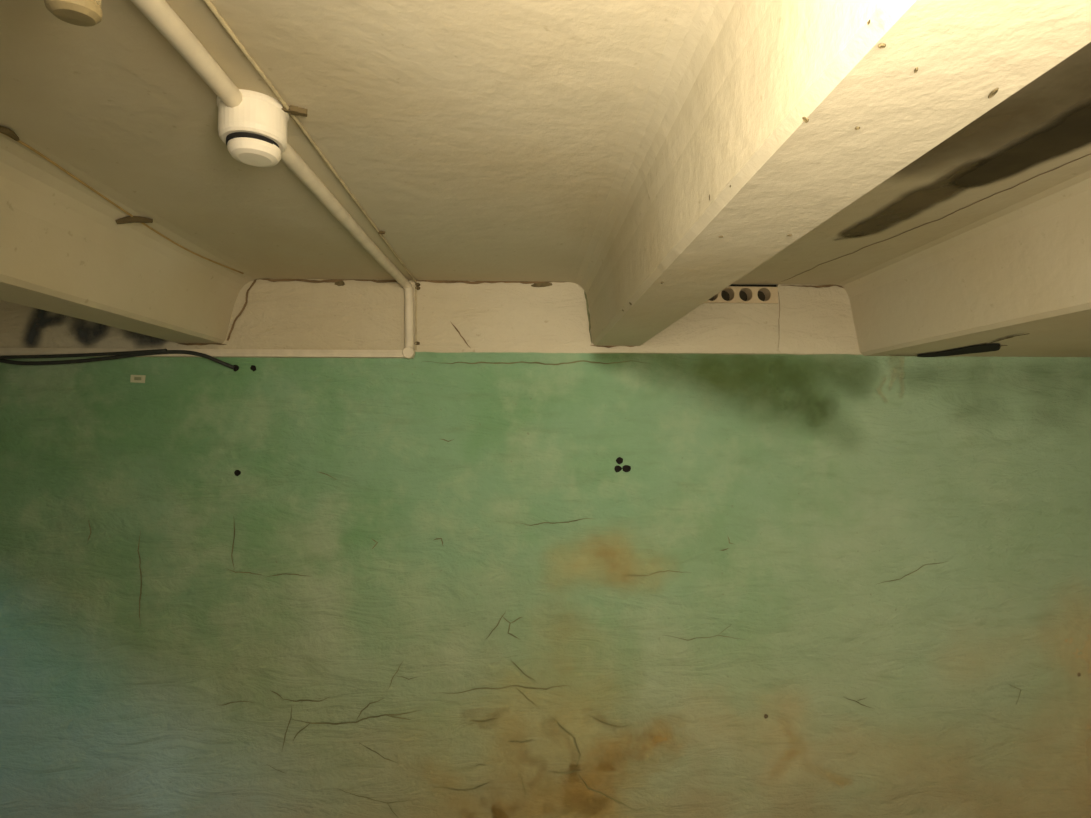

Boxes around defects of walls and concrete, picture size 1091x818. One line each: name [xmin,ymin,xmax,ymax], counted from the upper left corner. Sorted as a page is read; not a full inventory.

leakage [836,42,1091,240]
leakage [692,355,812,402]
crack [222,611,637,816]